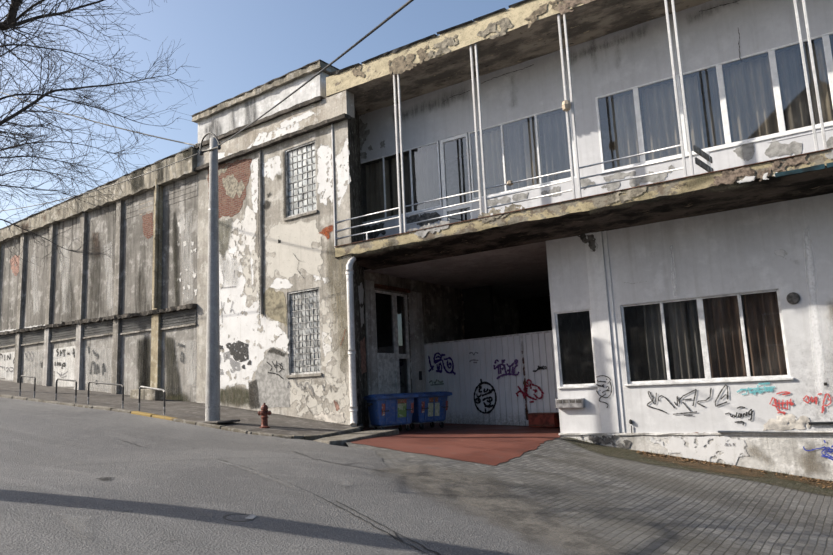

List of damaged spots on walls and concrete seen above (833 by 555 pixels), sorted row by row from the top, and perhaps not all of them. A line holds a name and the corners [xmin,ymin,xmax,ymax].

spalling [524,0,594,28]
spalling [580,165,675,206]
flaking render [713,139,808,186]
water stain [60,246,74,318]
water stain [90,240,112,314]
water stain [173,212,193,307]
peeling [207,110,351,424]
water stain [805,236,833,399]
water stain [137,337,151,389]
water stain [165,336,181,400]
spalling [581,435,631,449]
peeling [650,435,749,465]